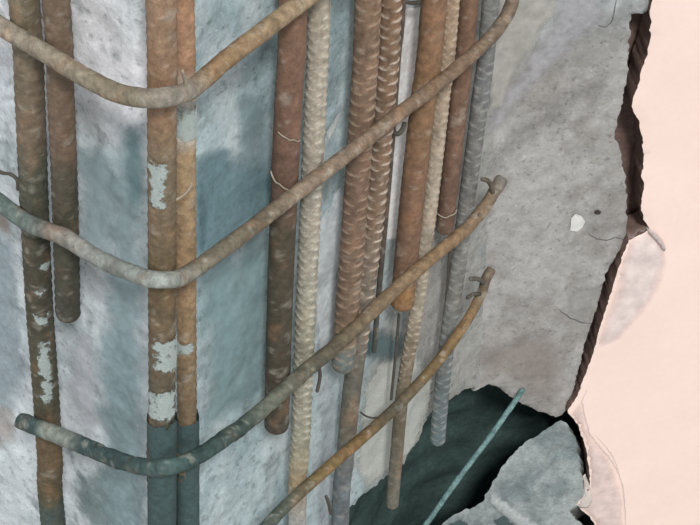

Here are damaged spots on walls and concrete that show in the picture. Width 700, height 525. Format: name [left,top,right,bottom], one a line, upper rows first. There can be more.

spalling [12,45,79,235]
spalling [145,0,196,88]
spalling [147,101,198,271]
spalling [270,0,331,203]
spalling [347,0,406,145]
spalling [333,42,496,352]
spalling [35,436,66,525]
spalling [21,229,81,427]
spalling [146,279,200,461]
spalling [146,464,200,525]
spalling [265,184,323,397]
spalling [331,350,558,525]